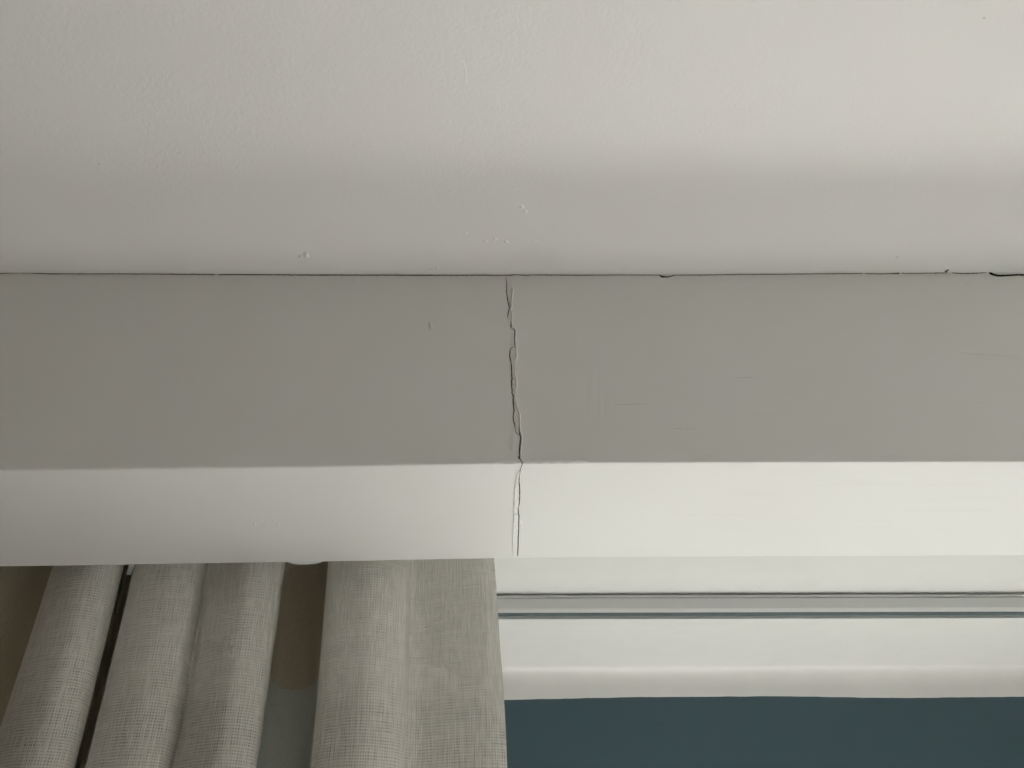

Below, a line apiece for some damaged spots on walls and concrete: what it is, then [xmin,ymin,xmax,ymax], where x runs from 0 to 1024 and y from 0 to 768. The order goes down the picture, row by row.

crack [682,271,791,279]
crack [816,269,987,277]
crack [33,273,607,556]